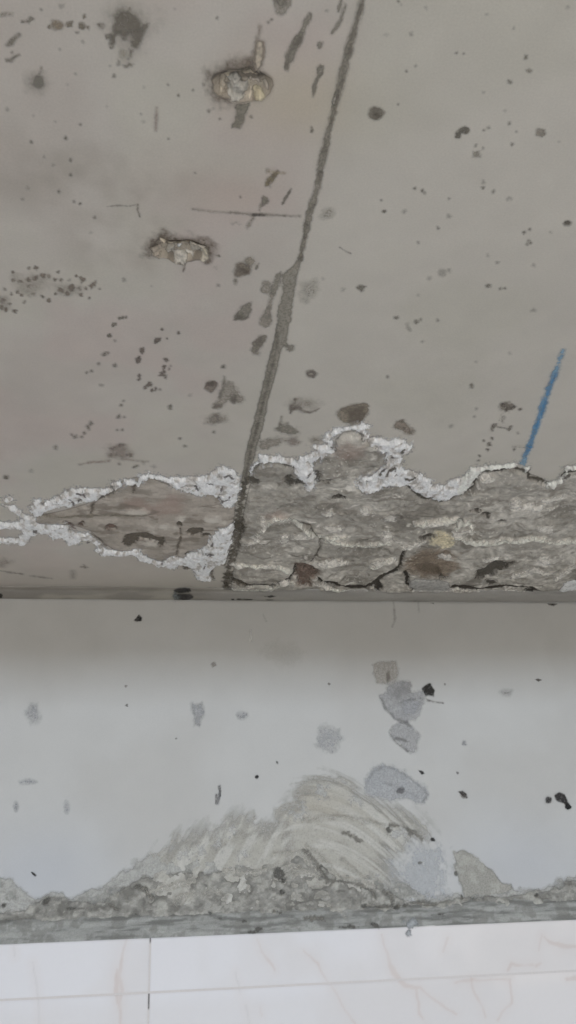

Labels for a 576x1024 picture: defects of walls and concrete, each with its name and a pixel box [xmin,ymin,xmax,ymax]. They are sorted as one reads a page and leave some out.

spalling [208,30,273,128]
spalling [146,233,213,271]
crack [211,3,414,590]
crack [44,485,138,546]
leakage [0,399,530,600]
spalling [36,431,576,593]
leakage [545,465,576,490]
crack [451,584,537,592]
peeling [365,764,426,803]
hole [546,792,571,809]
spalling [302,849,437,908]